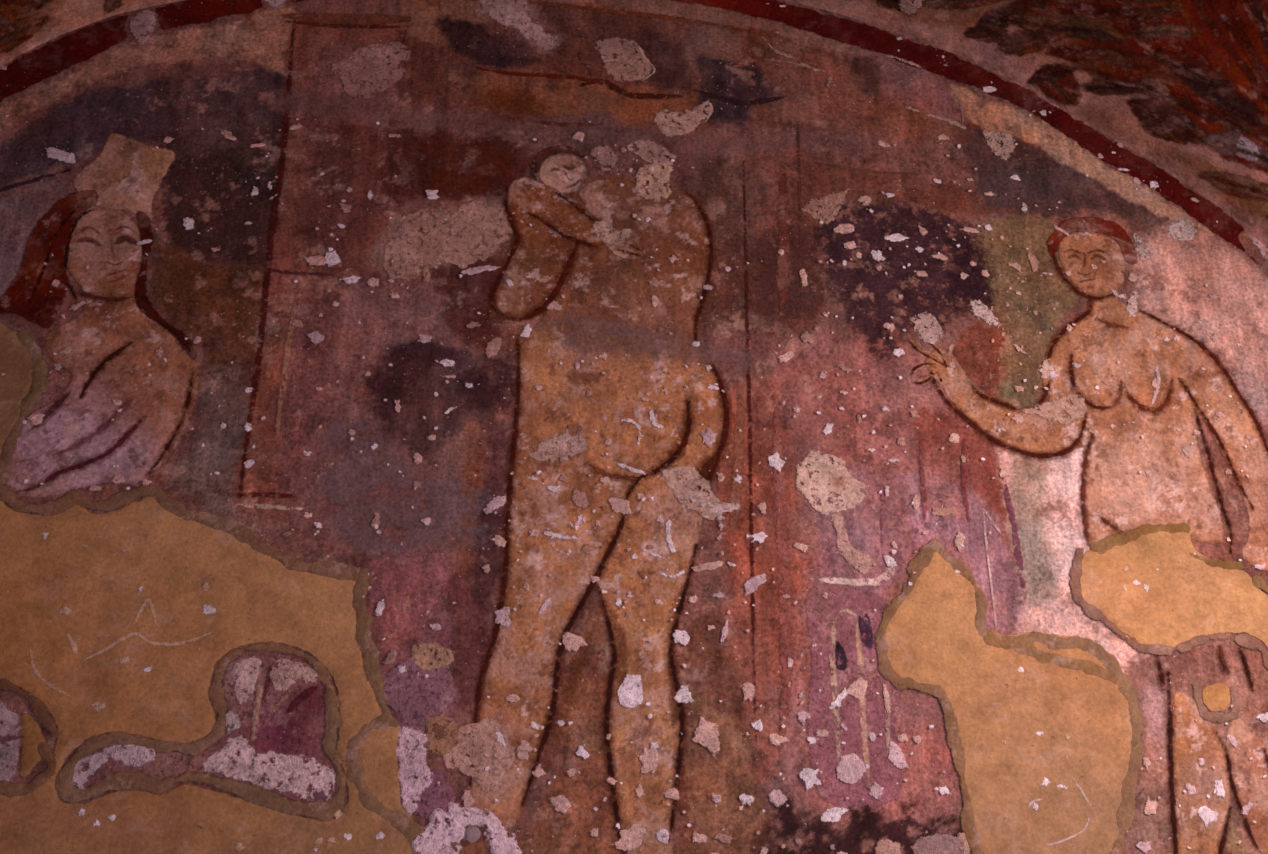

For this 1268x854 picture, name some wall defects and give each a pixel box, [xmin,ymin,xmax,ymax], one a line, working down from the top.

peeling [595,37,656,82]
peeling [572,99,714,202]
peeling [593,214,666,246]
peeling [647,249,689,316]
peeling [547,294,565,311]
peeling [560,353,607,374]
peeling [759,449,898,574]
peeling [753,830,803,854]
peeling [875,831,971,854]